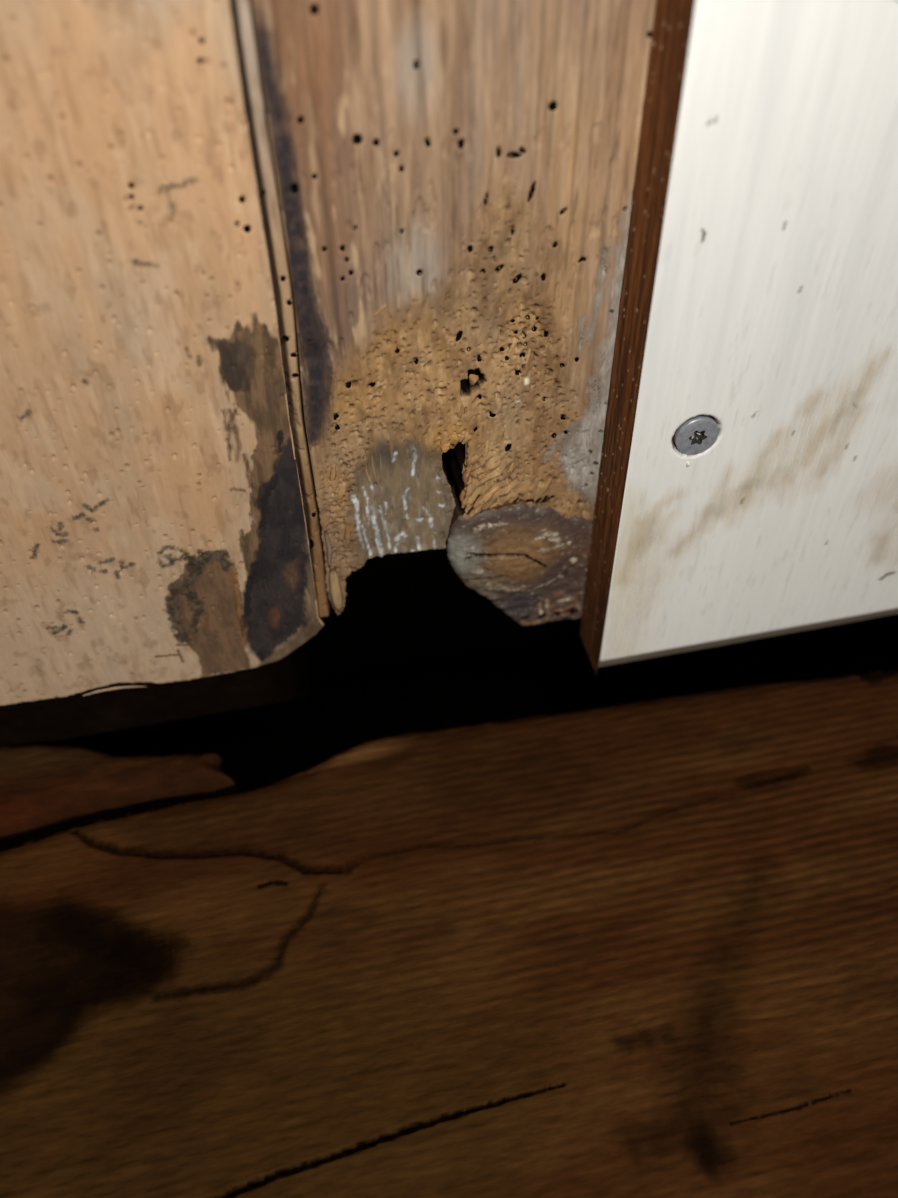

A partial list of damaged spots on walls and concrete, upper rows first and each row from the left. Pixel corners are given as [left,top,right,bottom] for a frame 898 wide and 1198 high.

damp [258,32,332,445]
damp [242,430,323,666]
peeling [324,530,343,612]
spalling [440,368,486,452]
peeling [460,429,504,520]
crack [0,790,352,1000]
damp [0,907,174,1086]
crack [224,1084,565,1198]